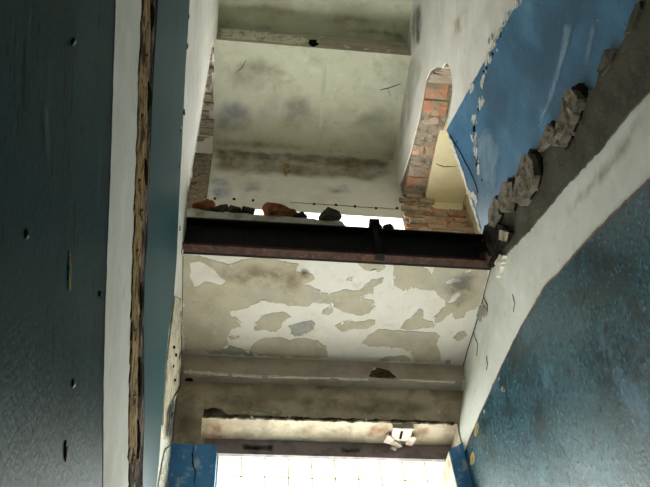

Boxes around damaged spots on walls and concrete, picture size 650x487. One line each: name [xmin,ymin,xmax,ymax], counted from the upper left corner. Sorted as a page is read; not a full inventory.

flaking render [411,67,452,156]
peeling [469,0,522,186]
water stain [258,156,320,175]
water stain [325,158,382,177]
peeling [157,136,514,487]
crack [463,268,492,370]